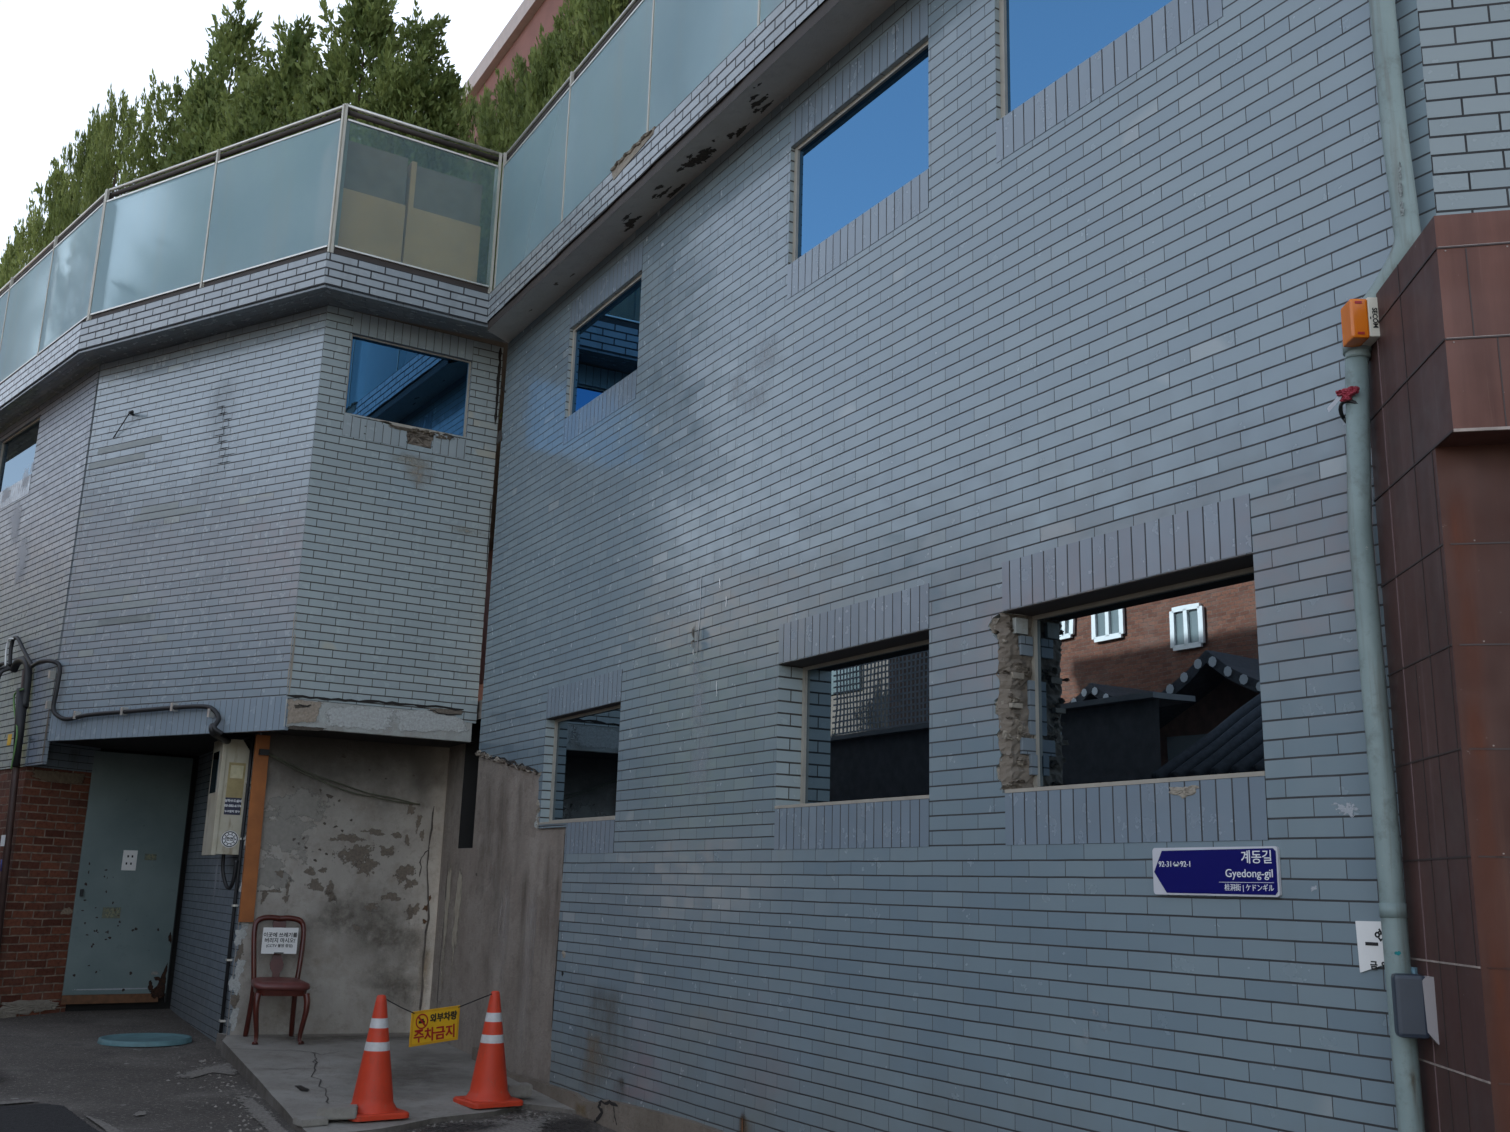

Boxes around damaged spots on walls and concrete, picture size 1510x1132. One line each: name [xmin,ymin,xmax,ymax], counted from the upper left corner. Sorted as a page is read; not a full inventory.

spalling [610,126,656,180]
peeling [652,83,774,199]
peeling [622,213,642,232]
peeling [239,786,431,947]
peeling [228,922,249,1031]
crack [289,1050,339,1103]